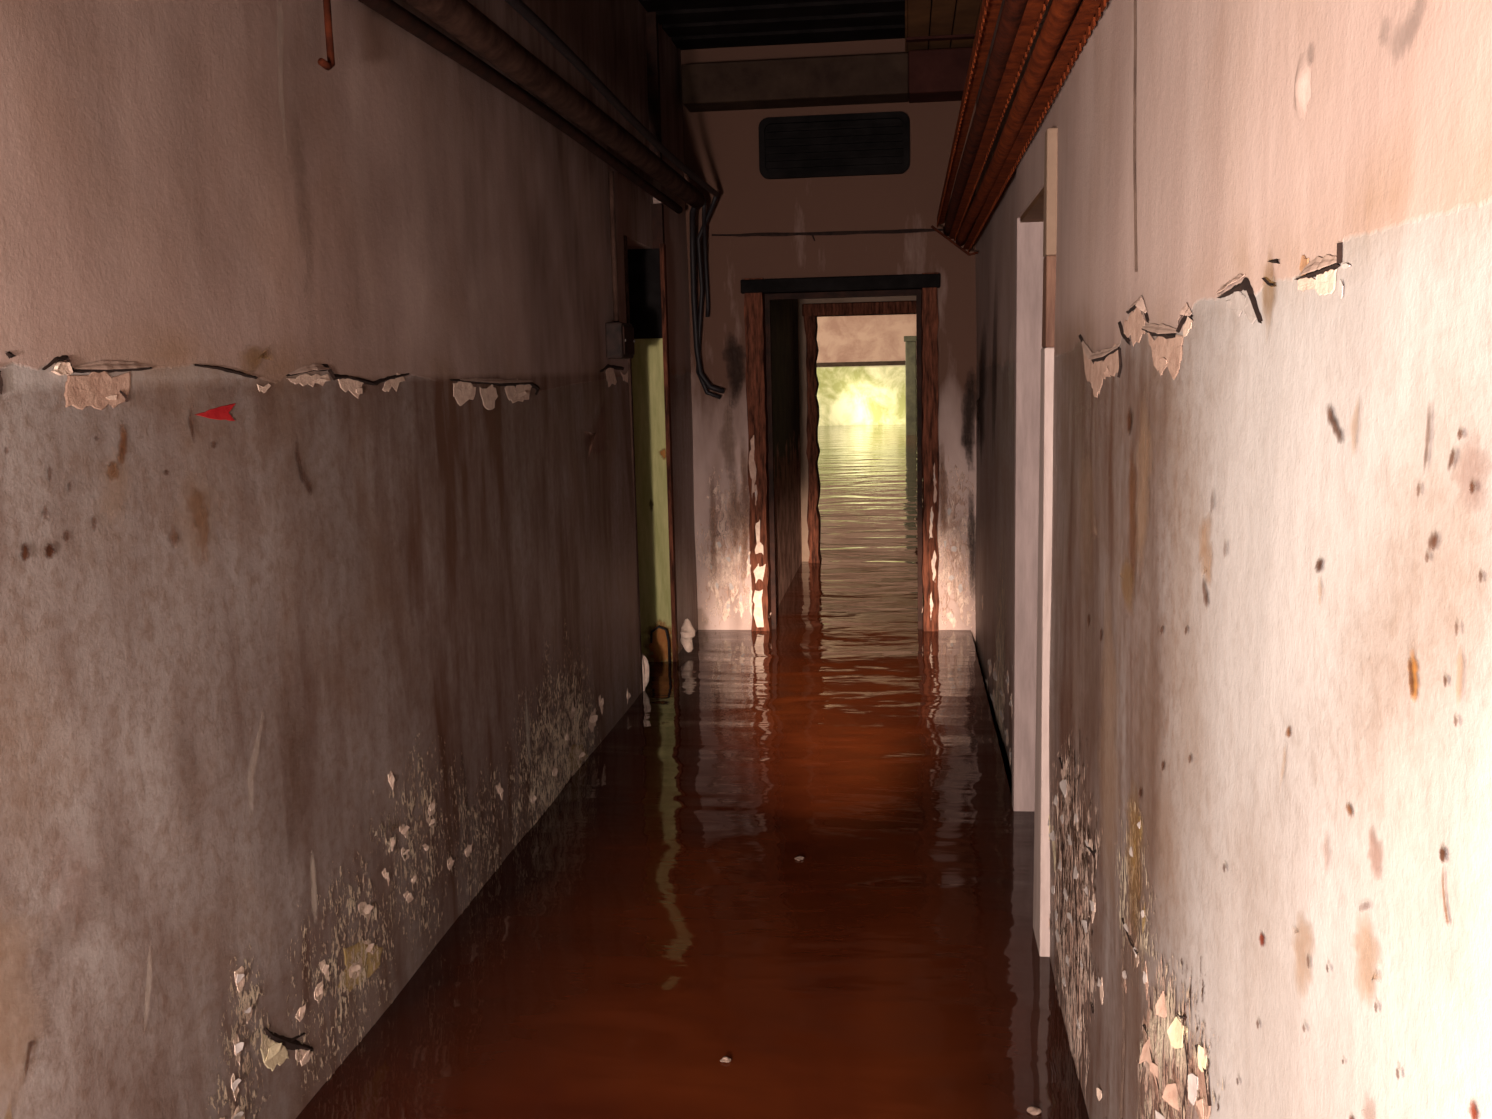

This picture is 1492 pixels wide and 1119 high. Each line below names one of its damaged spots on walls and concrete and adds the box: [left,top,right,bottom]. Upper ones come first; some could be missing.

peeling [1216,259,1280,324]
peeling [1295,242,1351,299]
peeling [1079,296,1193,398]
peeling [42,355,152,410]
peeling [257,364,409,398]
peeling [450,378,540,410]
peeling [206,619,604,1119]
peeling [1047,704,1223,1119]